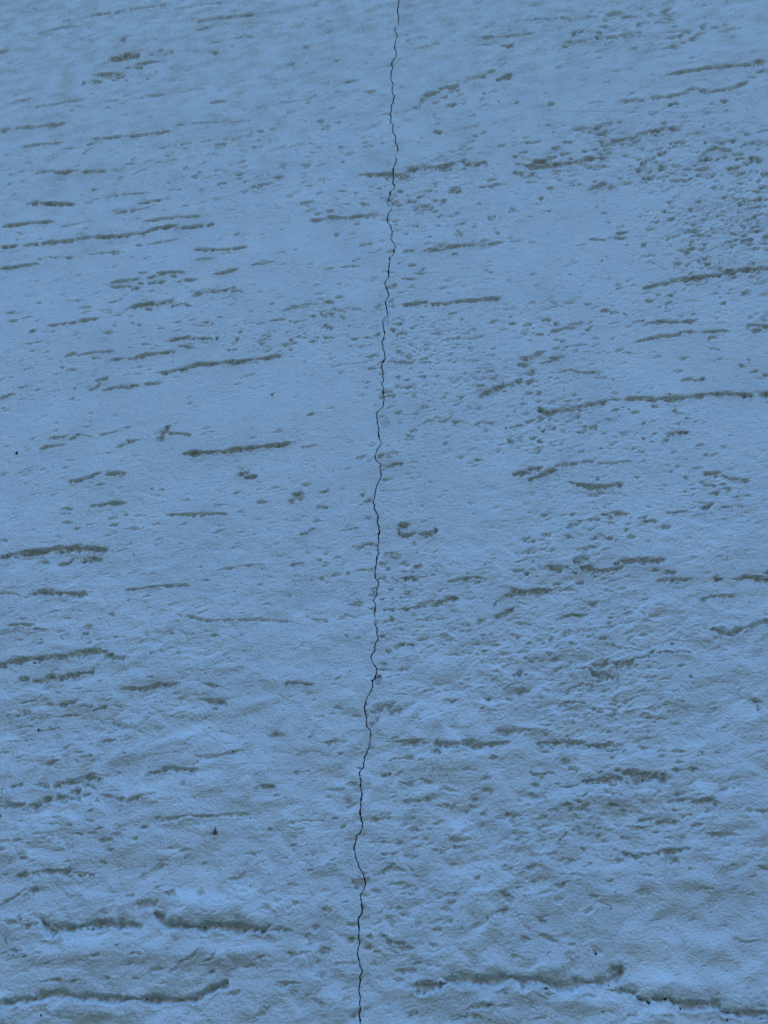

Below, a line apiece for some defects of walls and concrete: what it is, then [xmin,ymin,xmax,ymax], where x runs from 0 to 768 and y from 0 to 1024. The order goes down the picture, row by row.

crack [353,0,400,1024]